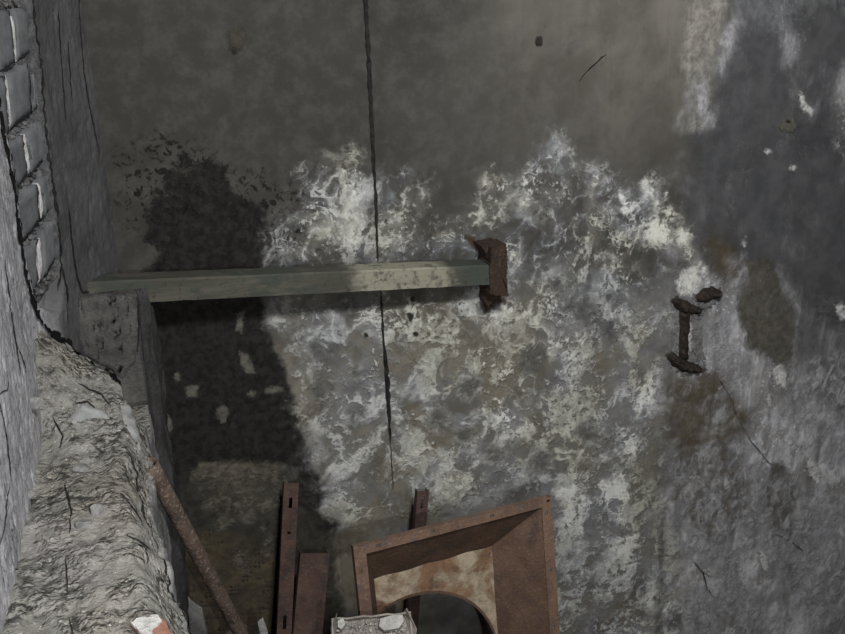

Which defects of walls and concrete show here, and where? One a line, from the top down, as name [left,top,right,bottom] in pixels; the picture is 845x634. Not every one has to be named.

crack [363,0,379,260]
water stain [116,130,416,265]
crack [0,0,122,545]
crack [110,290,140,354]
corrosion [483,297,505,311]
water stain [272,0,845,634]
spalling [71,403,110,424]
spalling [121,400,142,450]
crack [380,290,393,481]
crack [716,375,773,465]
water stain [198,530,276,632]